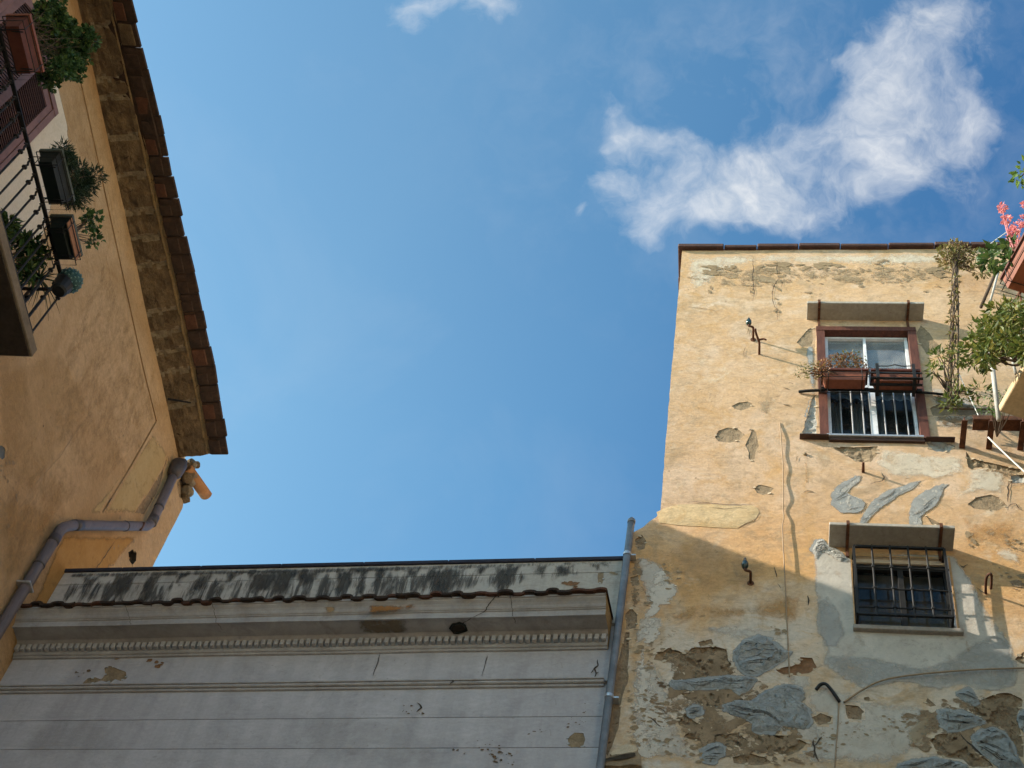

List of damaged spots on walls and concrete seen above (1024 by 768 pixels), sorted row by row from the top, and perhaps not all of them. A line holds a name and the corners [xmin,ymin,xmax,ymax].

peeling [688,259,952,317]
flaking render [732,401,753,410]
flaking render [714,427,759,461]
flaking render [752,485,774,495]
flaking render [968,495,1007,511]
leakage [35,537,523,603]
leakage [537,563,577,574]
flaking render [599,535,874,766]
peeling [75,658,128,684]
peeling [566,703,586,748]
flaking render [882,693,1024,768]